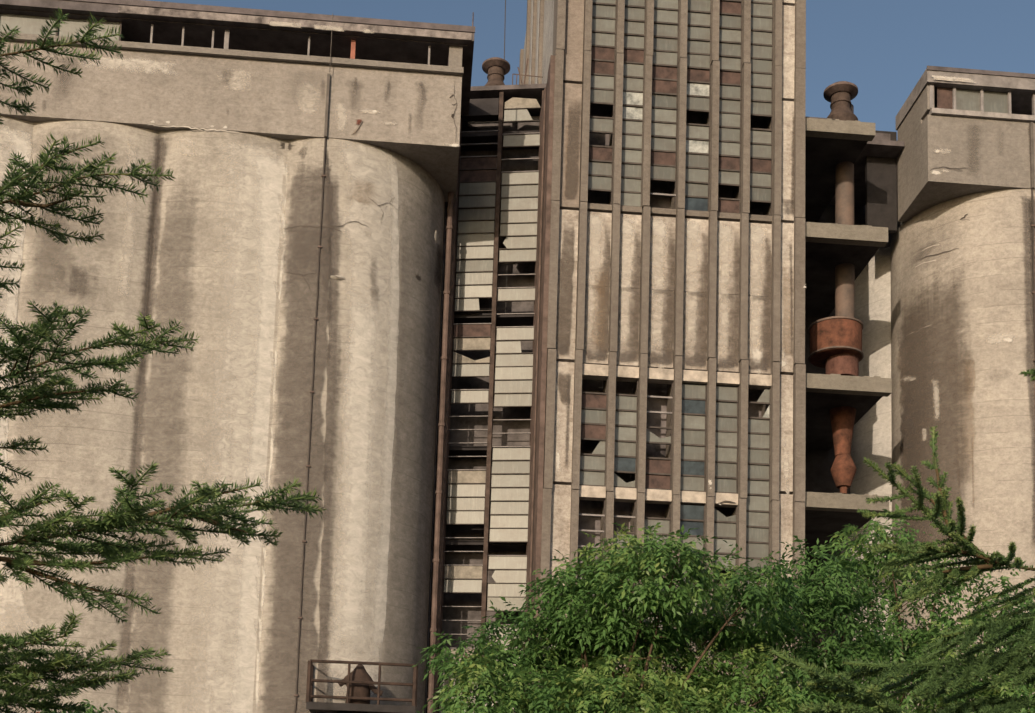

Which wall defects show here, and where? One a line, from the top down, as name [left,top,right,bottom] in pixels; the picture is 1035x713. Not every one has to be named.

damp [130,138,186,506]
damp [558,230,574,355]
damp [587,236,717,365]
damp [719,240,772,369]
damp [262,155,339,713]
damp [897,283,966,554]
damp [118,532,173,705]